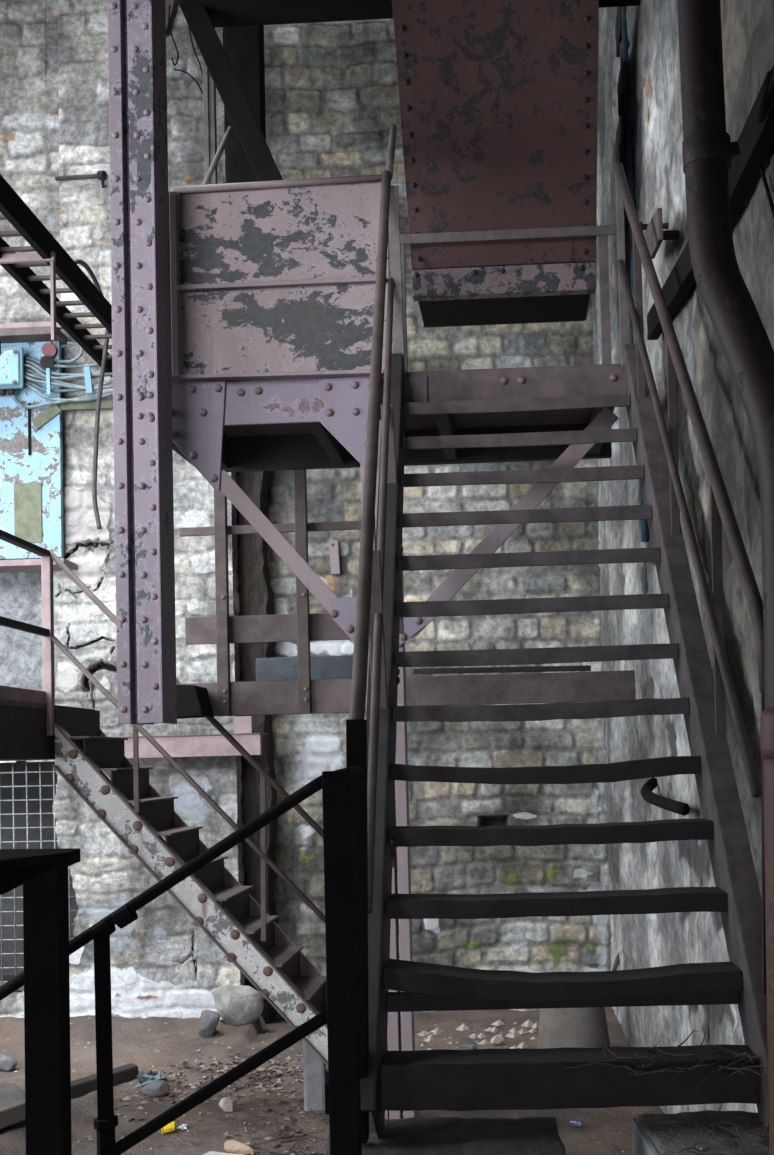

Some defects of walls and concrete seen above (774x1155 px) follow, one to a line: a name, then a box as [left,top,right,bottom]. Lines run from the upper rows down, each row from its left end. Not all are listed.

crack [56,538,112,597]
crack [65,624,117,708]
peeling [69,947,95,1017]
peeling [110,964,222,1020]